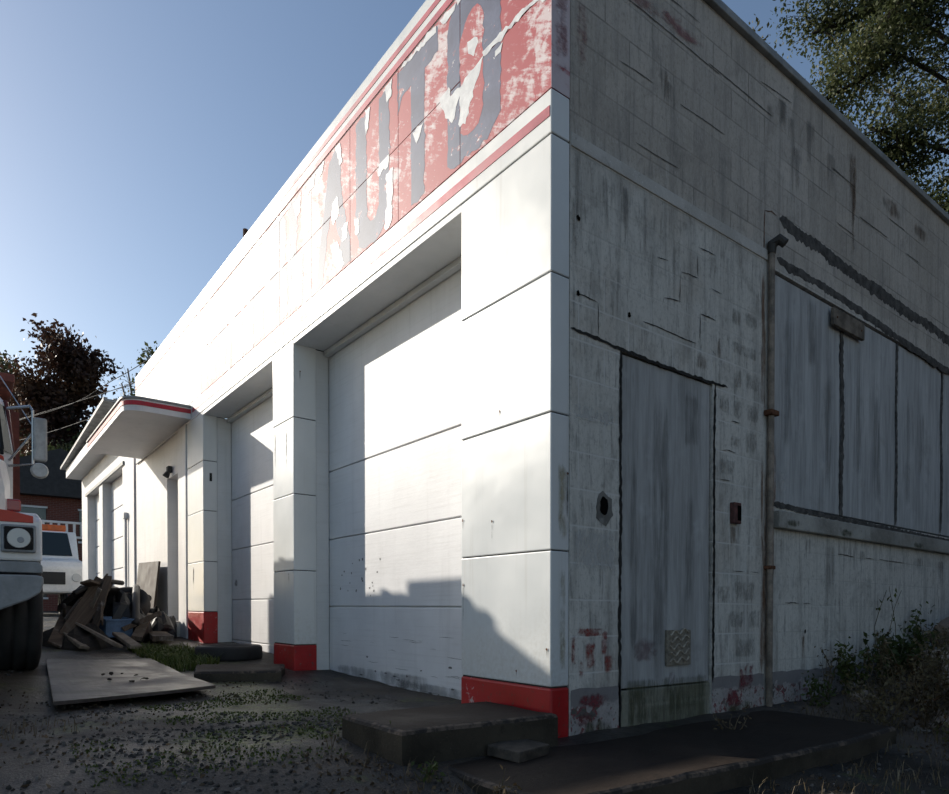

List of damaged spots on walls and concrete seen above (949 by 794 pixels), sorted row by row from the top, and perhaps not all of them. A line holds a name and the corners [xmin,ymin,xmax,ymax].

peeling [385,0,460,102]
peeling [440,0,545,127]
peeling [331,197,359,272]
peeling [378,154,393,230]